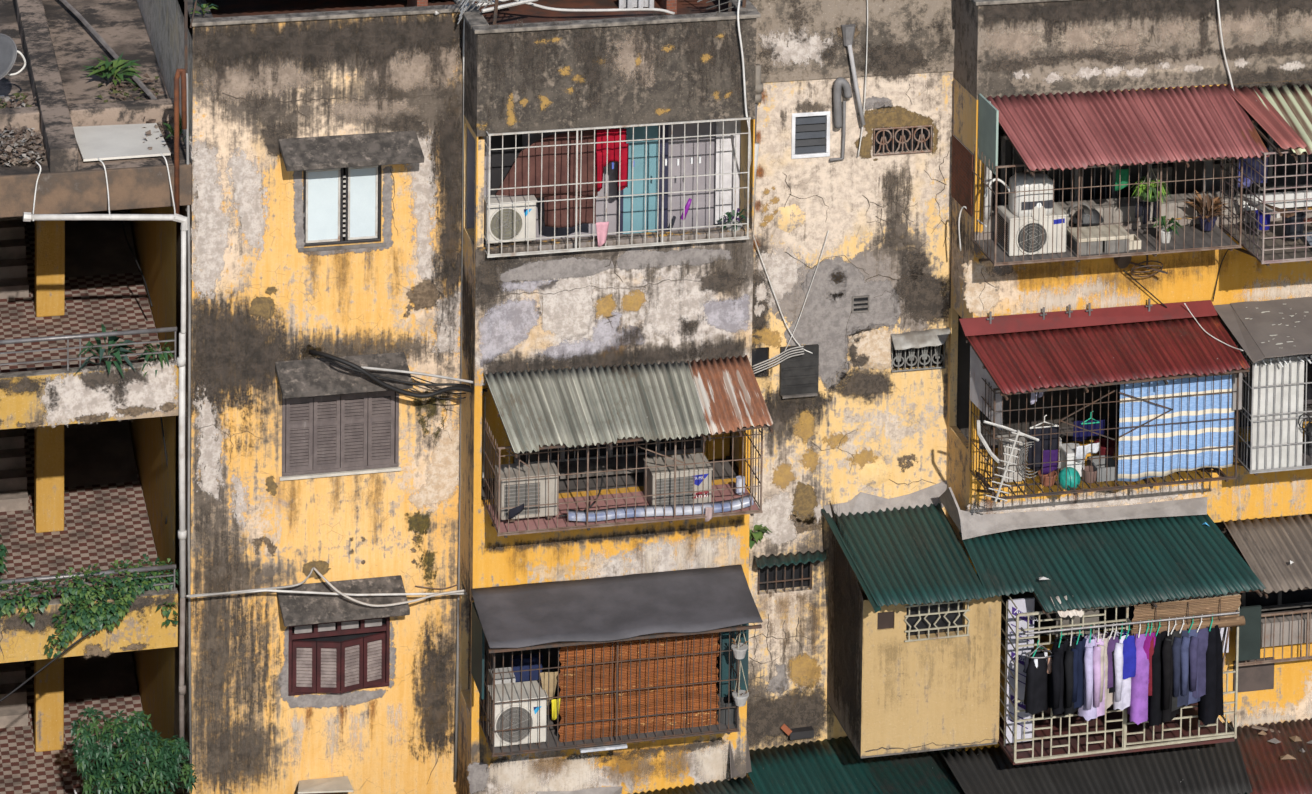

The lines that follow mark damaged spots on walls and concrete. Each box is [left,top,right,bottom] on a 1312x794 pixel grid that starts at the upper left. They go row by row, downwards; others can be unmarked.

damp [980,0,1312,52]
peeling [189,135,270,300]
peeling [331,48,461,357]
damp [186,6,780,464]
peeling [478,248,805,366]
crack [782,152,949,343]
damp [894,252,950,325]
peeling [0,359,278,557]
peeling [753,410,878,546]
damp [113,521,305,794]
damp [388,622,456,762]
damp [747,502,864,749]